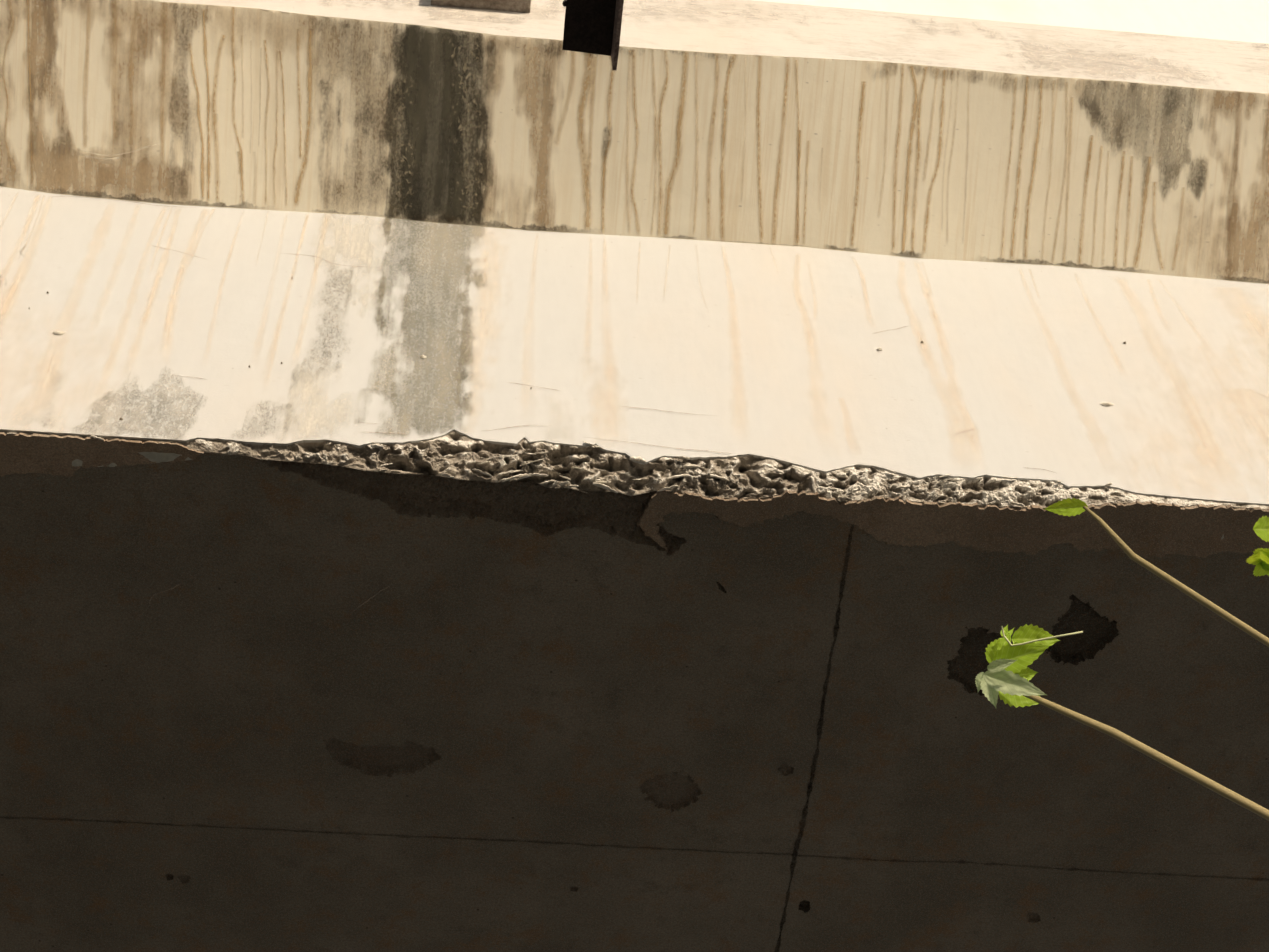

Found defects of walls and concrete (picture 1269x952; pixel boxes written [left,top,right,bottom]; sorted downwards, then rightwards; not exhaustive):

water stain [8,0,184,198]
water stain [112,3,218,198]
water stain [489,38,562,226]
water stain [579,53,593,151]
water stain [584,130,610,227]
water stain [1119,157,1155,265]
spalling [0,375,1269,559]
crack [775,526,853,952]
spalling [946,626,1012,696]
spalling [1045,594,1119,666]